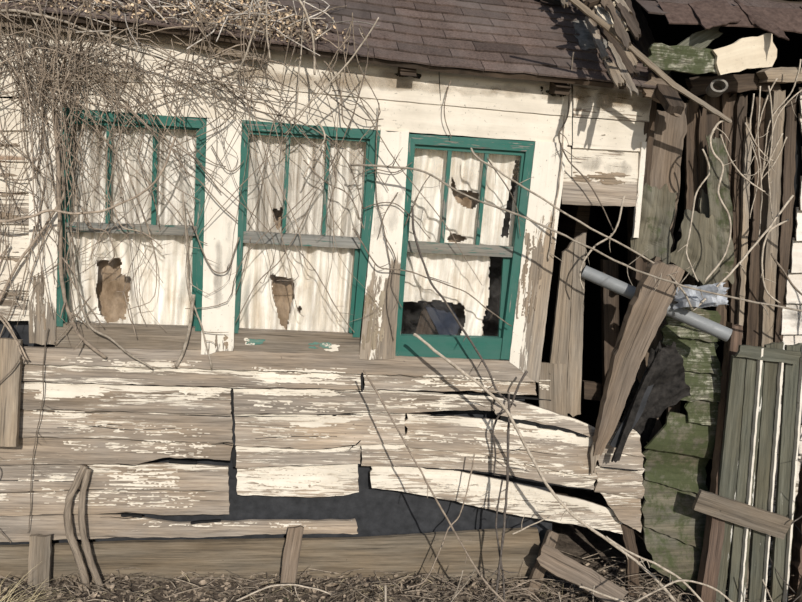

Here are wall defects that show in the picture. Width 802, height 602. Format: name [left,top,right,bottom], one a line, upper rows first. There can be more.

peeling [571,172,630,185]
peeling [516,229,544,324]
peeling [362,289,385,350]
peeling [61,357,201,372]
peeling [34,384,113,401]
crack [409,393,551,401]
peeling [31,410,215,457]
crack [496,416,588,455]
peeling [18,469,206,508]
crack [403,466,592,490]